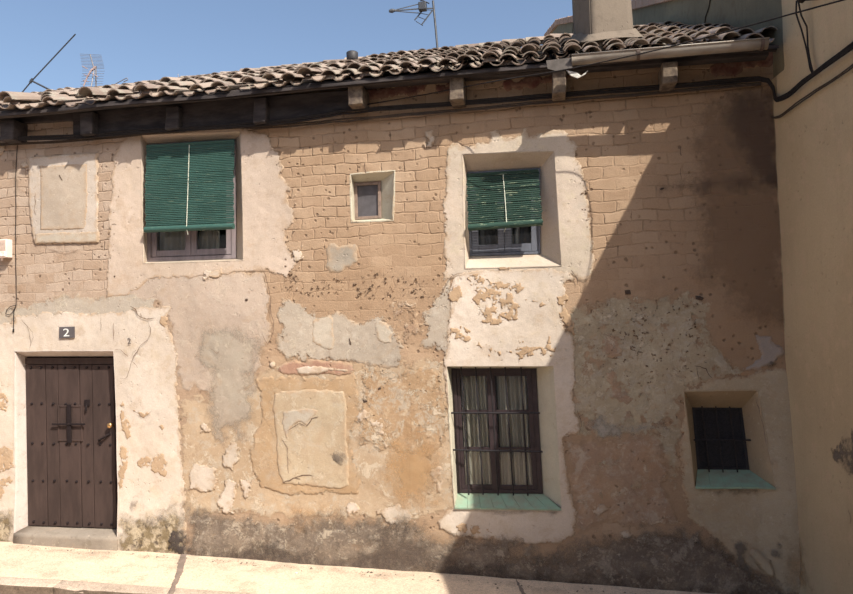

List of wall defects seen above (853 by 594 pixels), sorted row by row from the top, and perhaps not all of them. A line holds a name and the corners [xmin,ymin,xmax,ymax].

leakage [697,103,785,321]
peeling [448,273,547,325]
crack [100,306,153,379]
flaking render [129,268,453,496]
peeling [448,326,556,360]
flaking render [593,298,707,426]
peeling [0,446,14,499]
peeling [118,401,168,489]
crack [282,417,317,483]
leakage [0,511,13,542]
leakage [119,503,781,594]